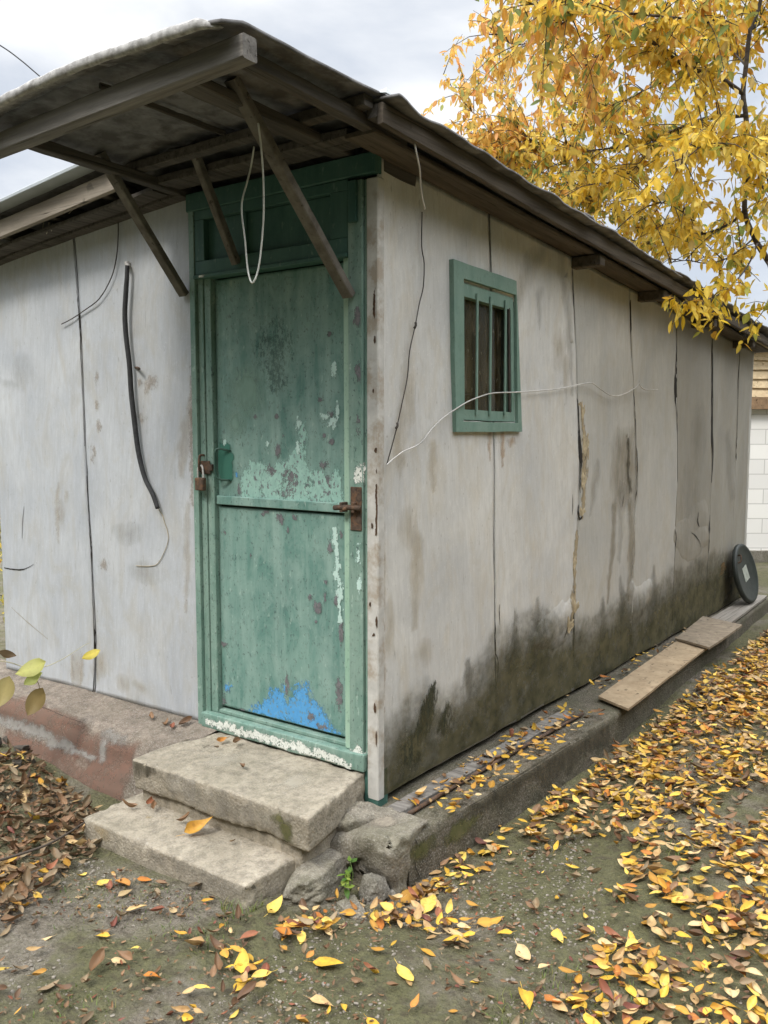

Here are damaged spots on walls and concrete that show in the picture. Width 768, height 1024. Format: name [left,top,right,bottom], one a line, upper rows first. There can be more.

peeling [353,291,375,328]
peeling [236,416,378,536]
peeling [318,397,339,445]
crack [572,399,586,520]
crack [672,328,680,483]
peeling [308,527,344,646]
peeling [355,543,378,636]
peeling [205,718,377,770]
peeling [240,675,343,735]
damp [384,559,741,795]